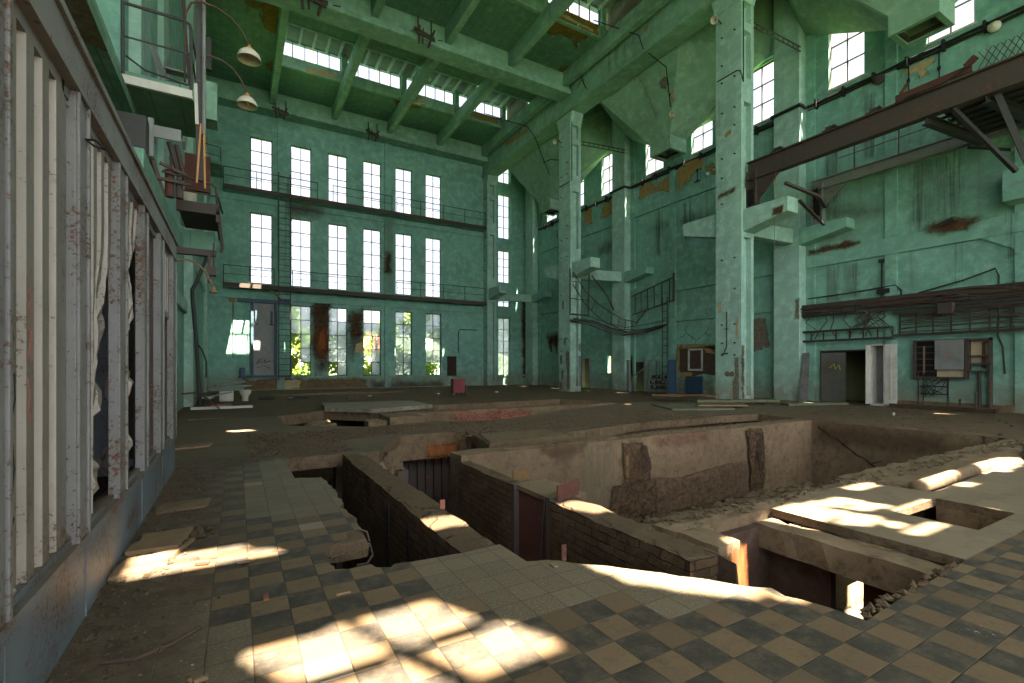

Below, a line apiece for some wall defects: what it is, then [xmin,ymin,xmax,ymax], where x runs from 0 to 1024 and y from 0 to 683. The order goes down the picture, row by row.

peeling [559,11,601,46]
peeling [638,157,716,200]
corrosion [927,216,979,234]
corrosion [809,241,860,255]
crack [818,426,881,468]